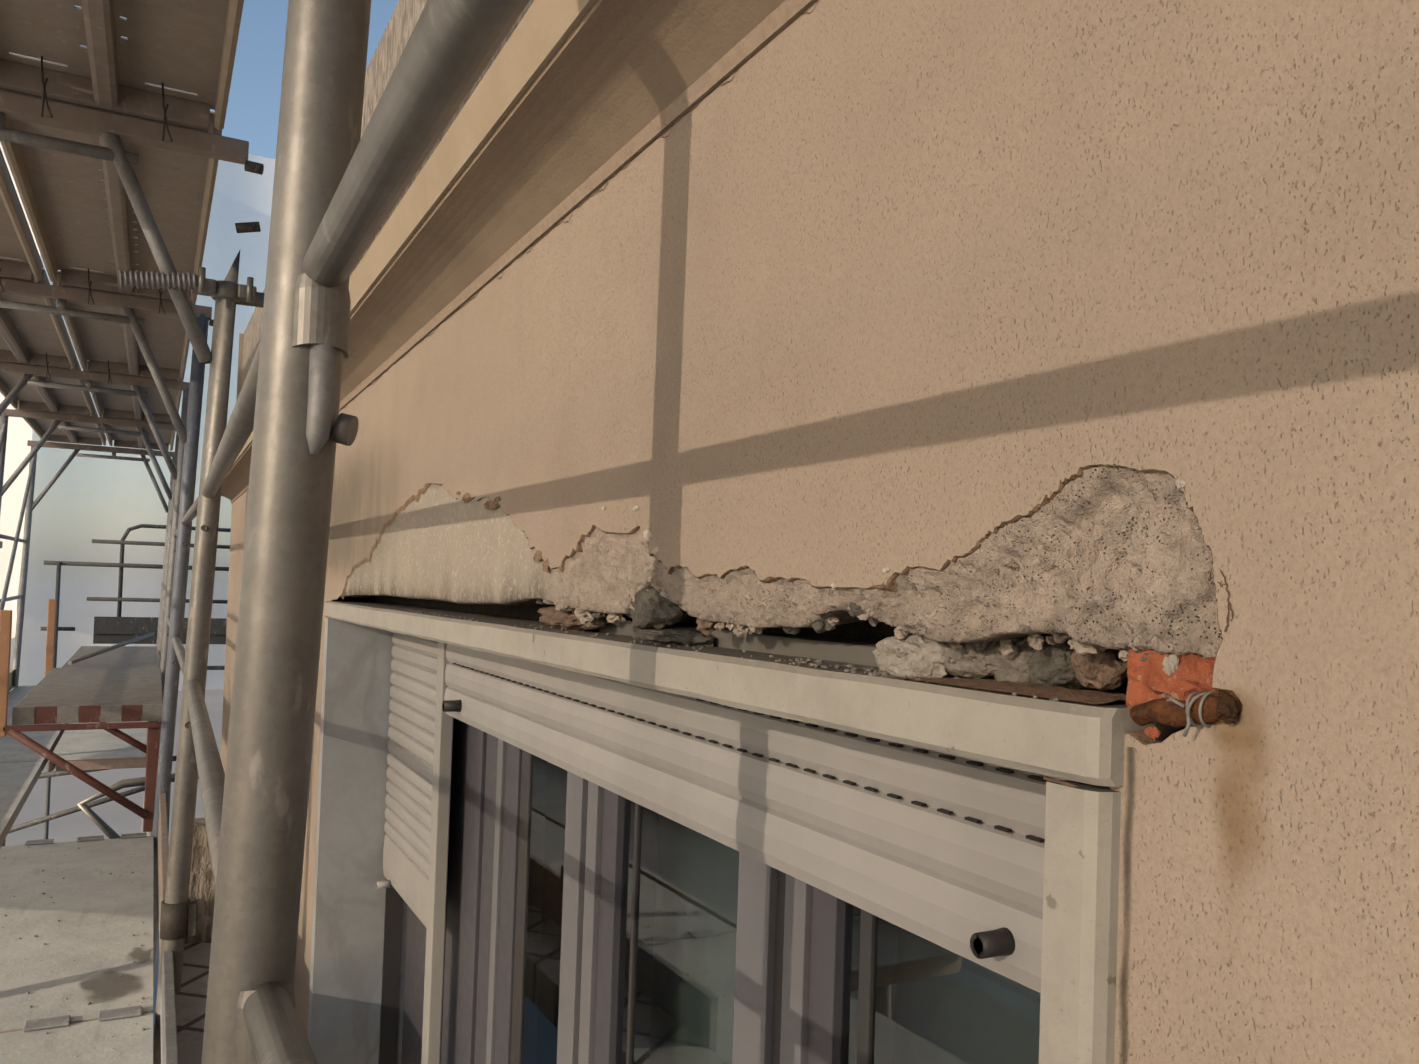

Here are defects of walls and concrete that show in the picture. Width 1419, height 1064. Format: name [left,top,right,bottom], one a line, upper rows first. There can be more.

spalling [341,464,1243,726]
spalling [1128,725,1194,745]
rust [1130,691,1243,737]